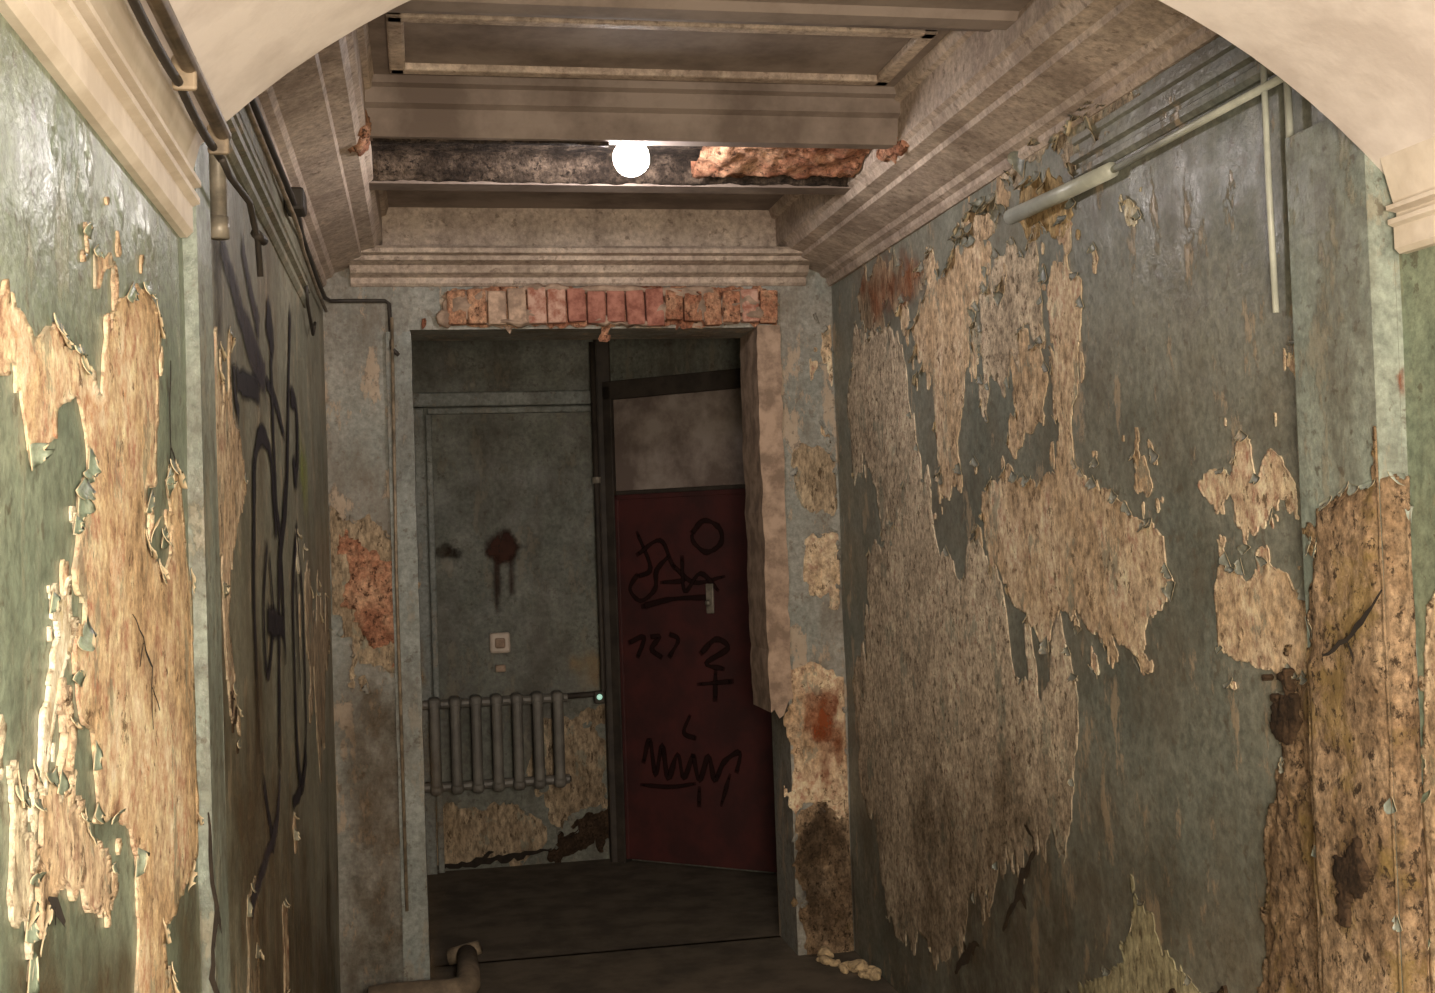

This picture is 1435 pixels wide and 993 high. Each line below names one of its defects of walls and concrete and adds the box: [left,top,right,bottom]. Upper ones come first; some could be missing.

spalling [348,109,909,187]
peeling [0,222,204,993]
peeling [214,326,248,754]
spalling [295,505,395,783]
peeling [435,704,609,866]
peeling [783,92,1176,971]
peeling [1067,874,1228,993]
spalling [1197,418,1435,993]